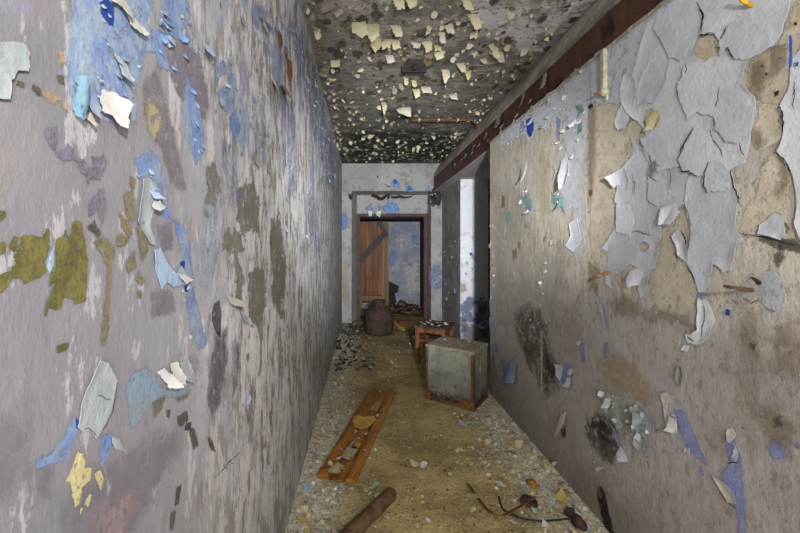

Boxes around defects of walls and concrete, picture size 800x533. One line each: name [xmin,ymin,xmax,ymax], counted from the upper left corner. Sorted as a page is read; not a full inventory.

peeling [0,126,107,316]
spalling [66,0,593,452]
peeling [499,0,800,352]
peeling [37,359,197,468]
spalling [170,485,181,531]
damp [516,311,556,393]
damp [585,414,618,471]
peeling [597,365,746,533]